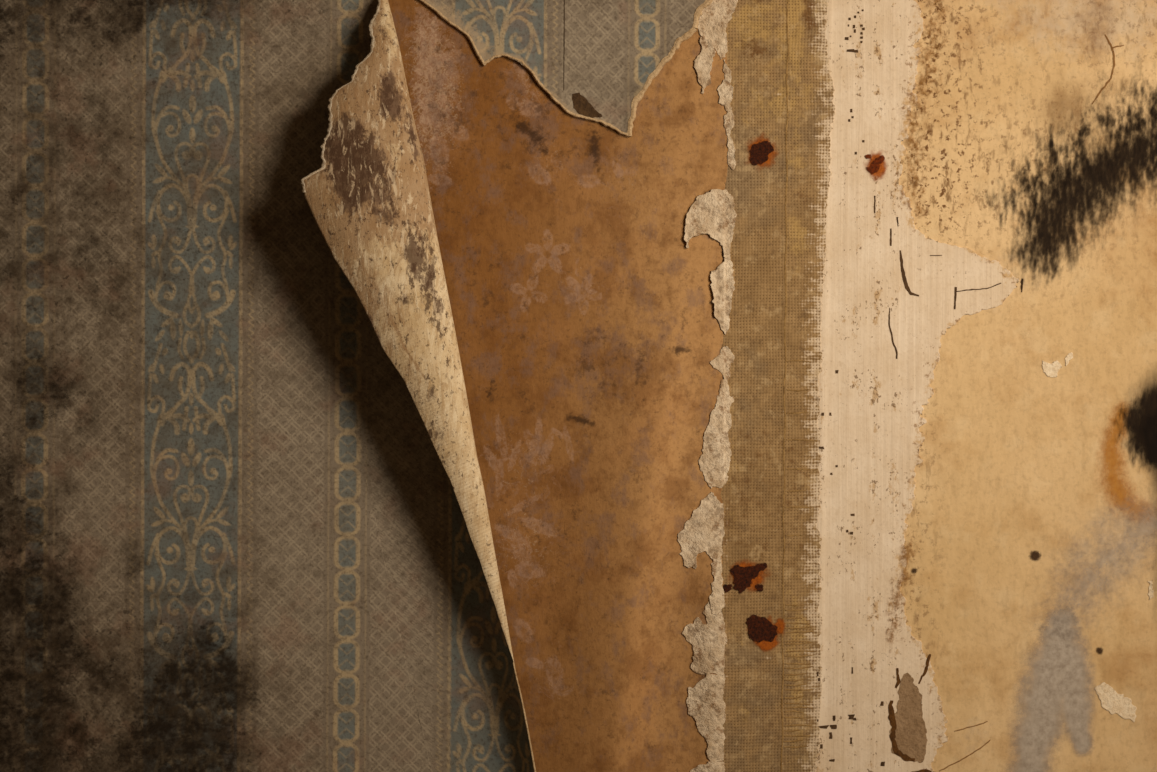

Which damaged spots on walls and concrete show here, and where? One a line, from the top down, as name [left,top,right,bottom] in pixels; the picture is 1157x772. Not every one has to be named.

spalling [845,9,865,53]
peeling [572,93,602,118]
rust [748,136,775,166]
rust [865,153,886,179]
peeling [301,0,536,772]
rust [723,562,767,593]
rust [746,615,785,651]
mould [0,556,83,772]
mould [118,628,251,772]
spalling [880,654,934,772]
hole [817,714,856,762]